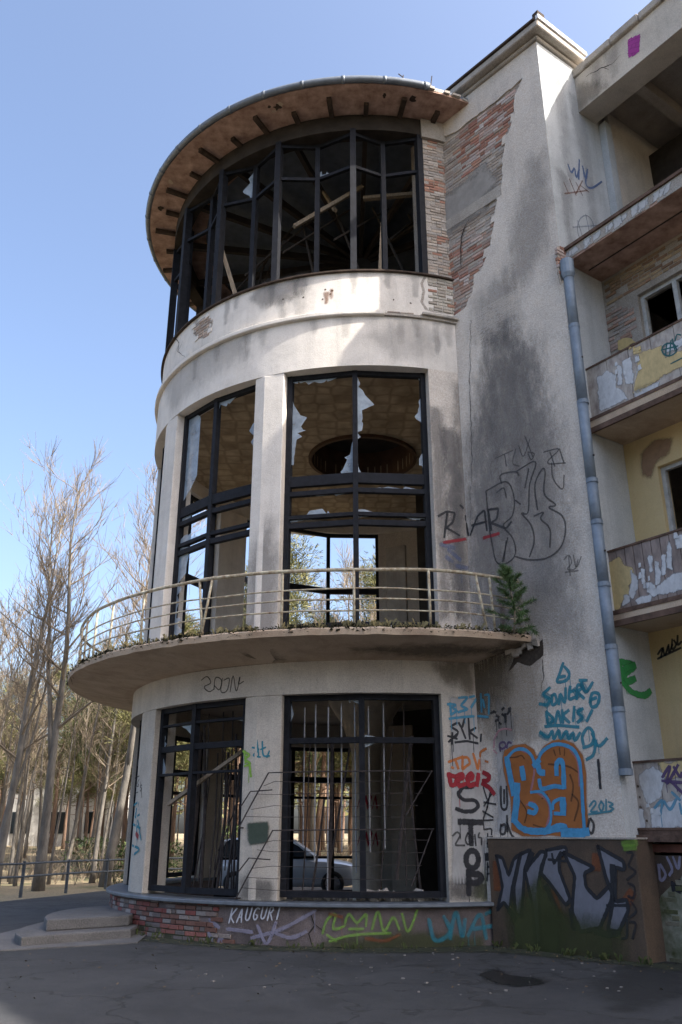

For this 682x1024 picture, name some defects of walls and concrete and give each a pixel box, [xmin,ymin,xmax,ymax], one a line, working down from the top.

flaking render [387,83,520,315]
flaking render [192,312,213,342]
peeling [597,236,682,411]
peeling [609,532,682,610]
spalling [505,638,543,671]
peeling [637,761,682,828]